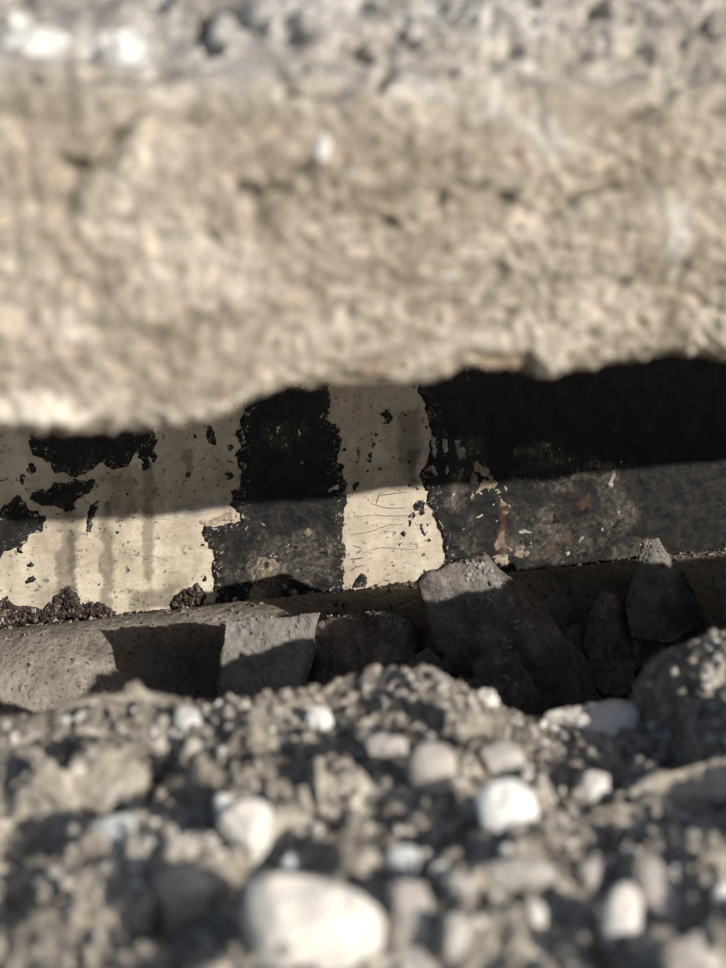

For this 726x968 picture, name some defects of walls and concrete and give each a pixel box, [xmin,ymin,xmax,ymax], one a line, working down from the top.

flaking render [0,585,116,629]
peeling [0,428,157,558]
peeling [170,383,407,610]
peeling [392,352,726,573]